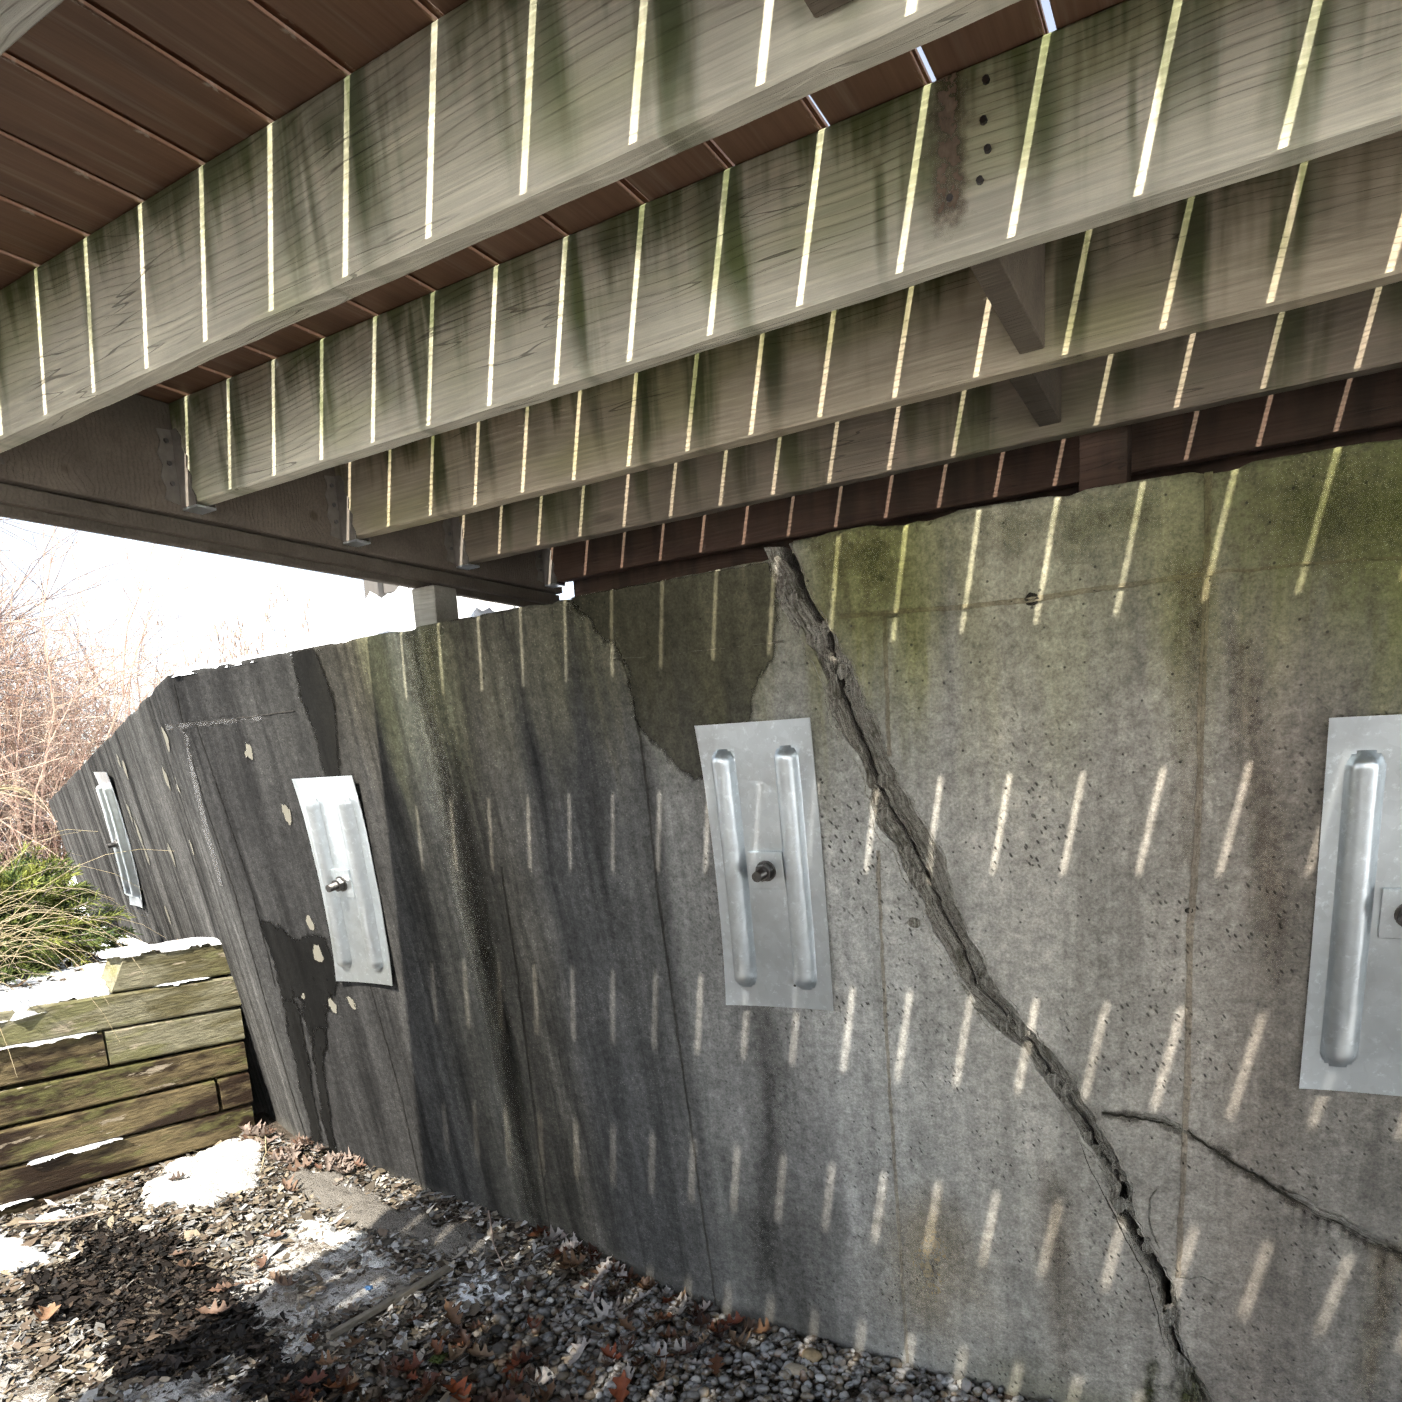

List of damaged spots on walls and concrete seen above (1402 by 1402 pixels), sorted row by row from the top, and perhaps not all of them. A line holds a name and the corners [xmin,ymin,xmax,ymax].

rust [934,71,966,221]
water stain [260,920,338,1154]
crack [764,542,1402,1402]